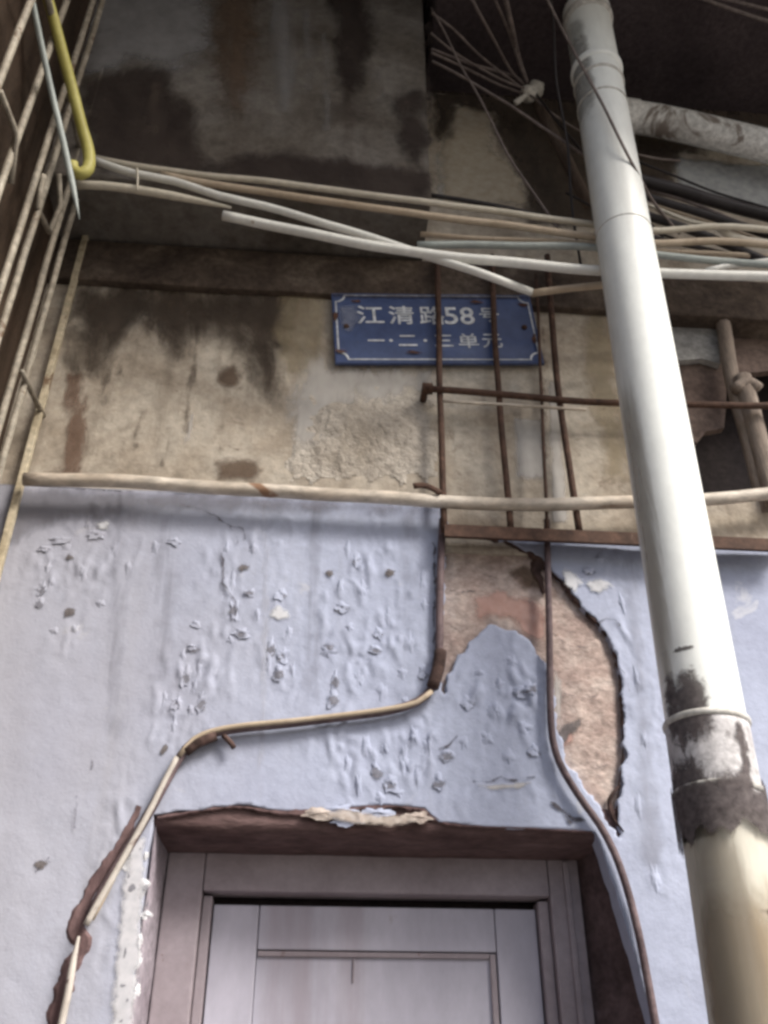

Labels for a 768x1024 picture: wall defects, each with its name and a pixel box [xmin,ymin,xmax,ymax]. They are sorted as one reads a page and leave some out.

damp [82,0,528,204]
damp [218,366,239,385]
damp [219,460,259,478]
spalling [441,553,625,809]
spalling [157,804,593,834]
peeling [112,838,153,1024]